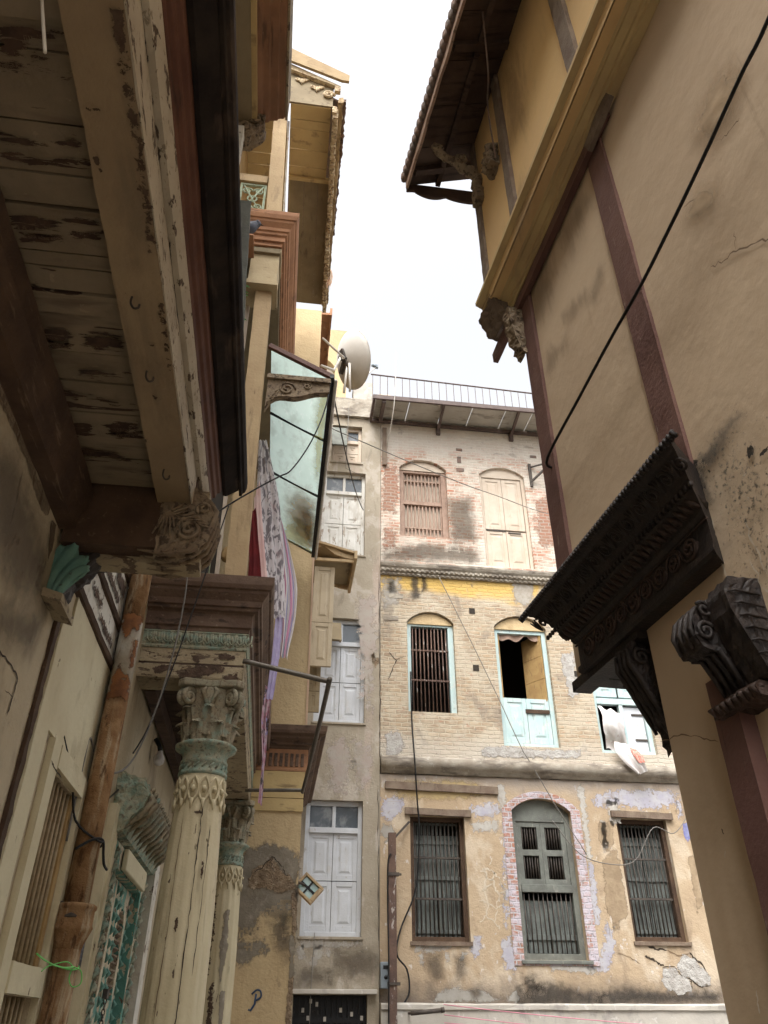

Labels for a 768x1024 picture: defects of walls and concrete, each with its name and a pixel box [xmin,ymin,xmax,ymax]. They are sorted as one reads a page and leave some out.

peeling [109,8,157,253]
peeling [8,213,102,243]
crack [711,236,768,267]
damp [386,500,475,562]
damp [695,421,768,576]
corrosion [105,612,142,702]
peeling [380,781,517,970]
flaking render [551,785,690,976]
flaking render [688,856,703,913]
peeling [206,843,362,1024]
damp [516,977,717,1004]
flaking render [661,954,711,995]